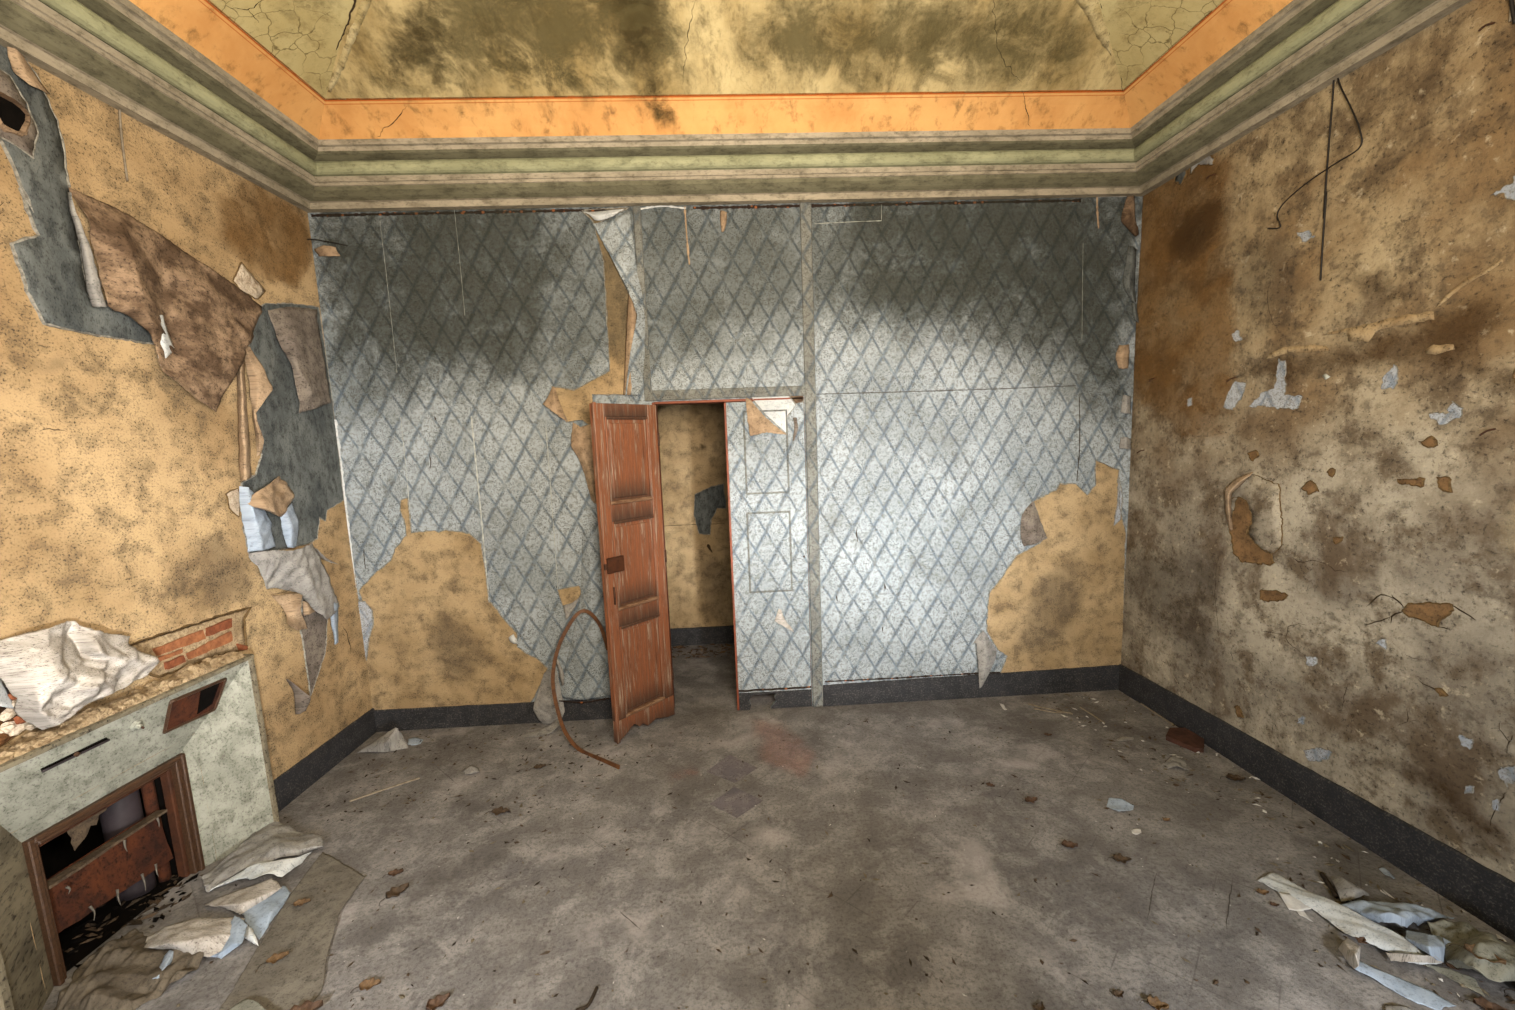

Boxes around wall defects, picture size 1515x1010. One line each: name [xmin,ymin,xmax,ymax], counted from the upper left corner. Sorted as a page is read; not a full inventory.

crack [336,0,356,50]
damp [378,0,679,87]
damp [756,0,1081,80]
spalling [0,69,39,159]
damp [653,105,673,121]
flaking render [232,262,266,300]
flaking render [225,488,240,517]
flaking render [1224,450,1283,566]
flaking render [1301,468,1336,495]
peeling [358,498,549,710]
peeling [986,460,1126,673]
flaking render [0,692,37,747]